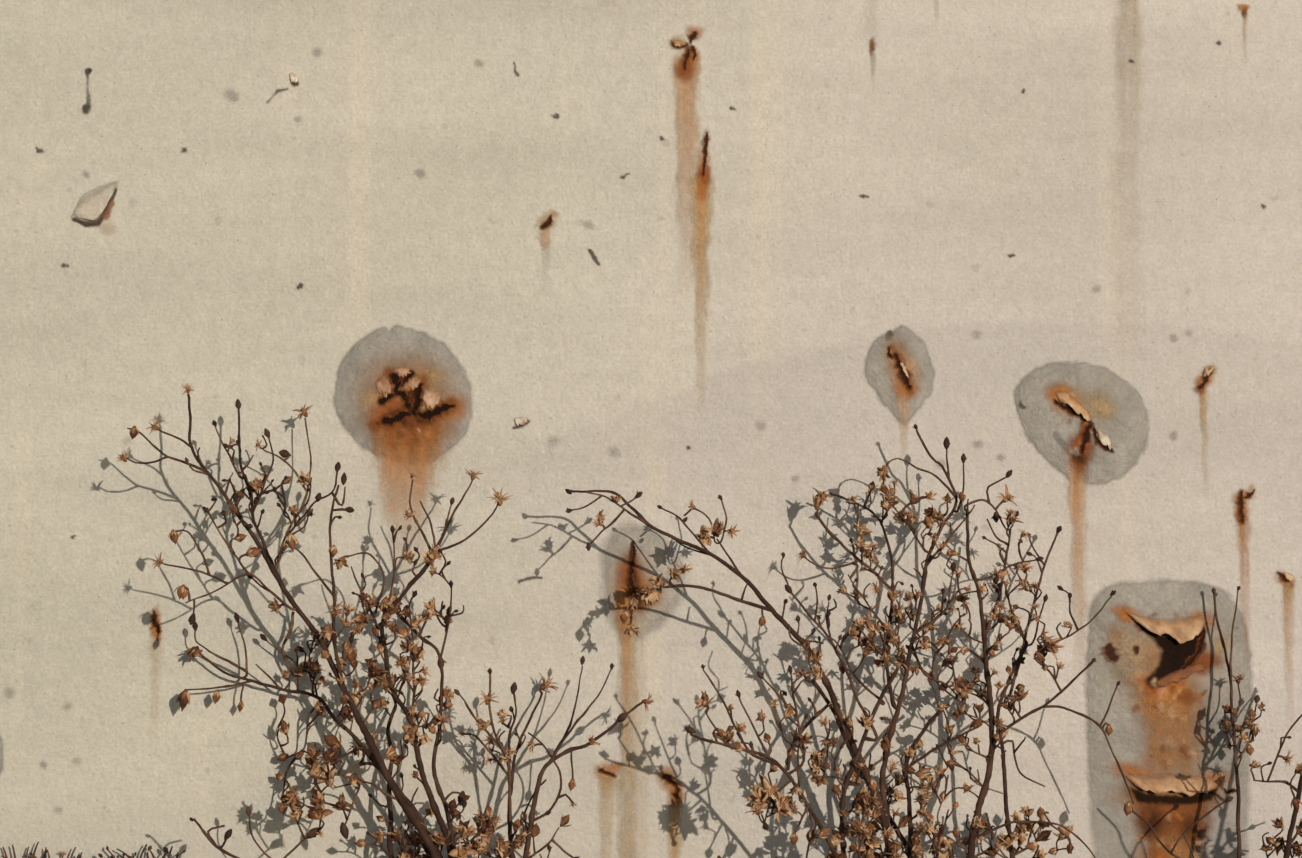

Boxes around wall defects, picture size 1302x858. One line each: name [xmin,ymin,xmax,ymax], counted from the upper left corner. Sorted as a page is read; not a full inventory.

peeling [71,182,118,227]
corrosion [540,212,556,246]
corrosion [671,28,711,310]
corrosion [334,326,471,517]
corrosion [865,326,934,423]
corrosion [1235,486,1255,557]
corrosion [1014,363,1251,858]
corrosion [1278,572,1294,638]
corrosion [598,527,683,858]